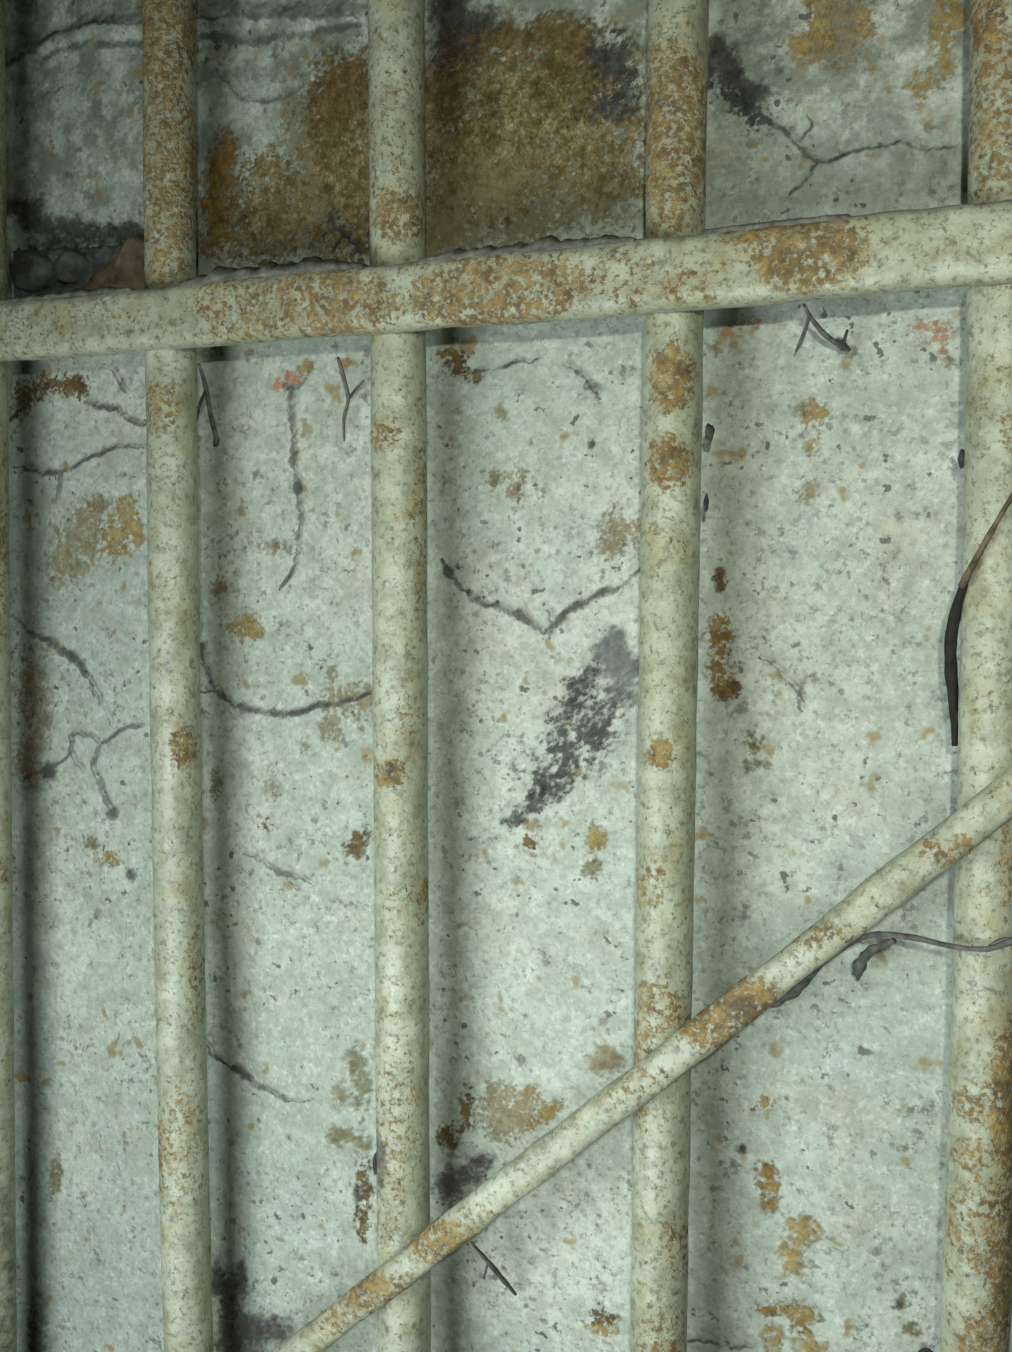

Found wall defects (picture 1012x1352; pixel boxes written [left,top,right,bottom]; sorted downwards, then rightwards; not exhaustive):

rust [196,41,370,267]
rust [425,10,647,257]
crack [739,85,954,195]
crack [13,369,146,503]
rust [46,494,144,589]
crack [279,377,307,591]
crack [440,557,640,640]
crack [10,615,143,821]
crack [200,642,371,718]
mould [500,626,639,832]
rust [739,1144,823,1277]
rust [755,1299,828,1352]